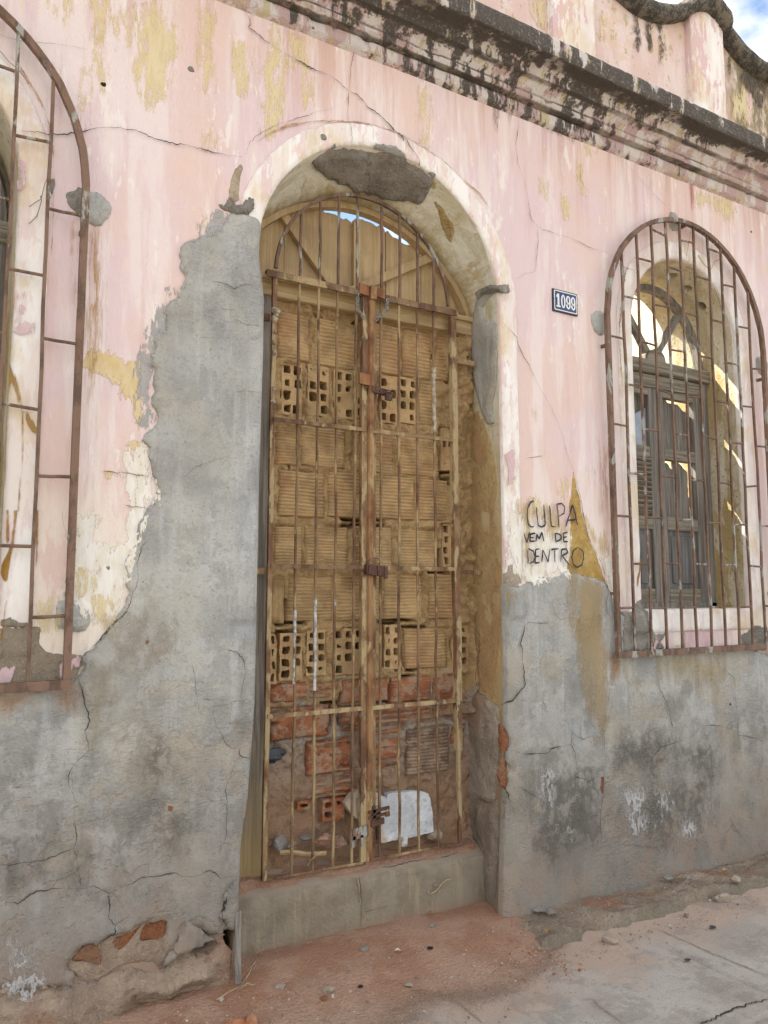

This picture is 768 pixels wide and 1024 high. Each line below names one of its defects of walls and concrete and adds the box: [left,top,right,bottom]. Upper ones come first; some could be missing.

crack [21,9,420,165]
water stain [632,14,667,63]
mould [727,56,768,108]
peeling [74,347,162,628]
spalling [0,598,85,683]
crack [3,649,251,941]
spalling [496,723,509,790]
crack [507,685,646,847]
water stain [622,786,713,838]
crack [631,662,764,775]
efflorescence [2,941,45,1002]
spalling [67,879,239,997]